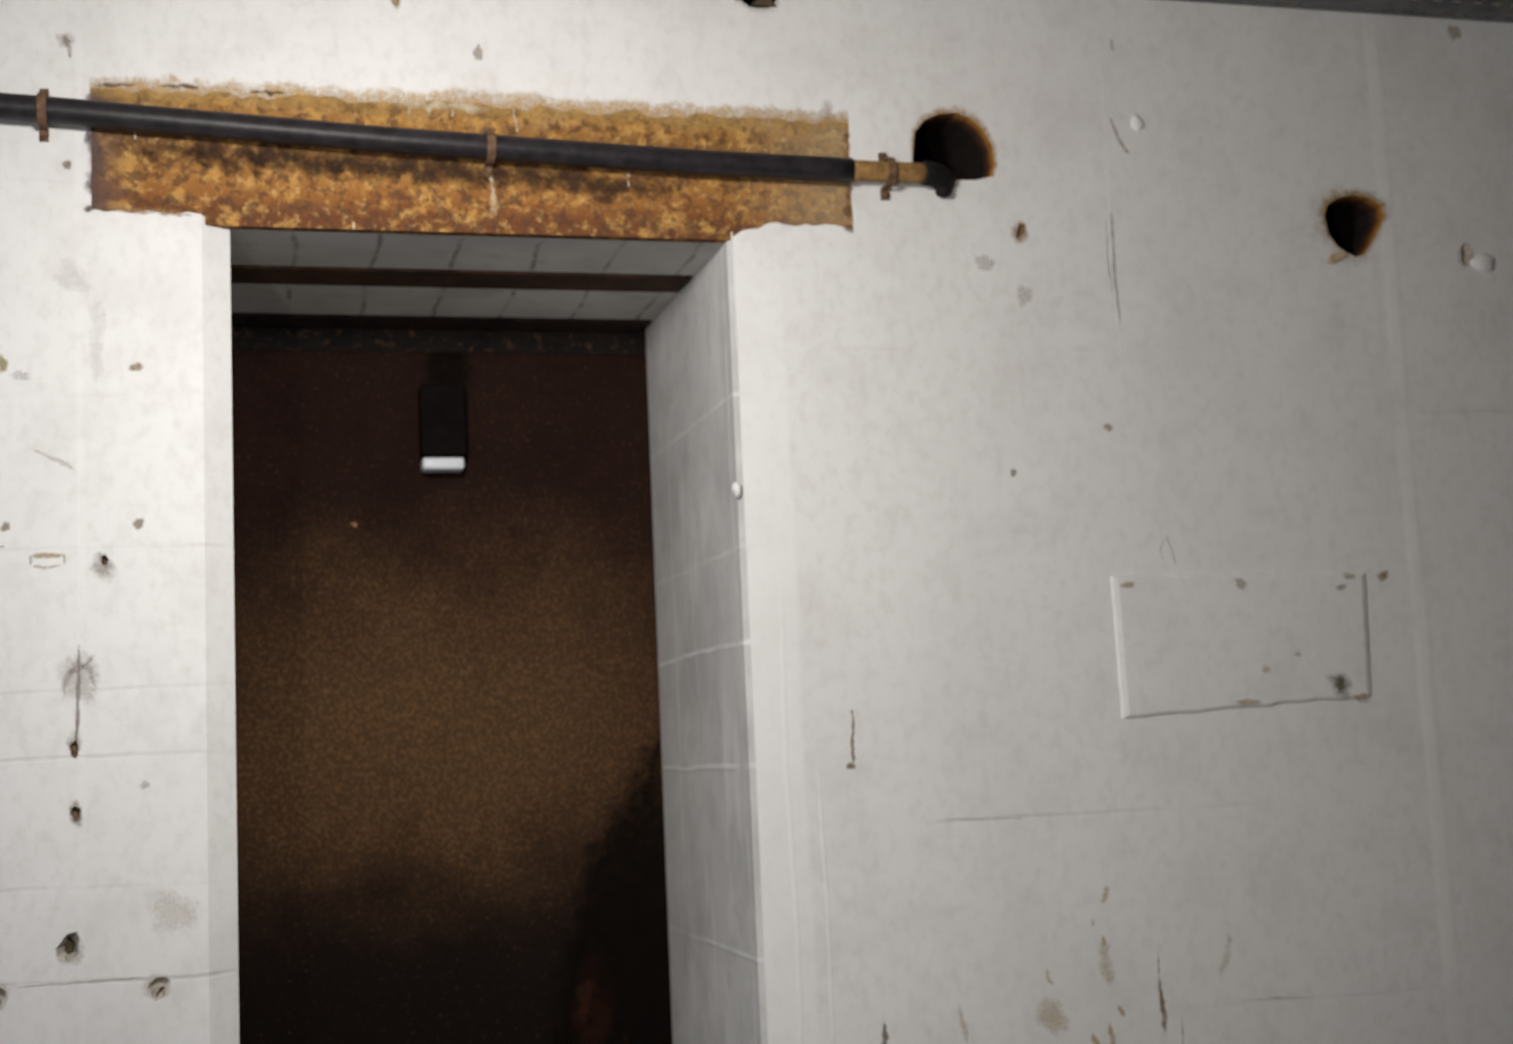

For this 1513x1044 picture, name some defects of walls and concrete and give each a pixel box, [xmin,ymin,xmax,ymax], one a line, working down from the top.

spalling [741,0,777,8]
spalling [912,111,996,180]
spalling [1322,192,1385,265]
spalling [56,932,81,962]
spalling [146,975,170,1001]